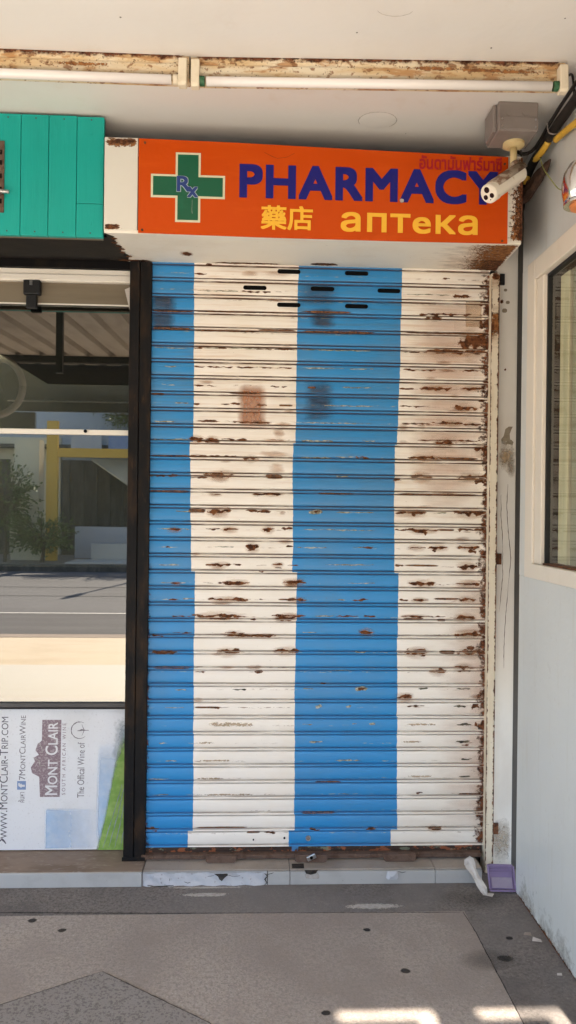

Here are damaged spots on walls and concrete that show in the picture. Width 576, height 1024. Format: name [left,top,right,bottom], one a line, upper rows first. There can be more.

rust [223,386,292,424]
rust [153,437,255,461]
rust [150,471,233,479]
rust [189,507,238,531]
rust [394,271,500,864]
rust [208,581,263,602]
rust [172,613,276,654]